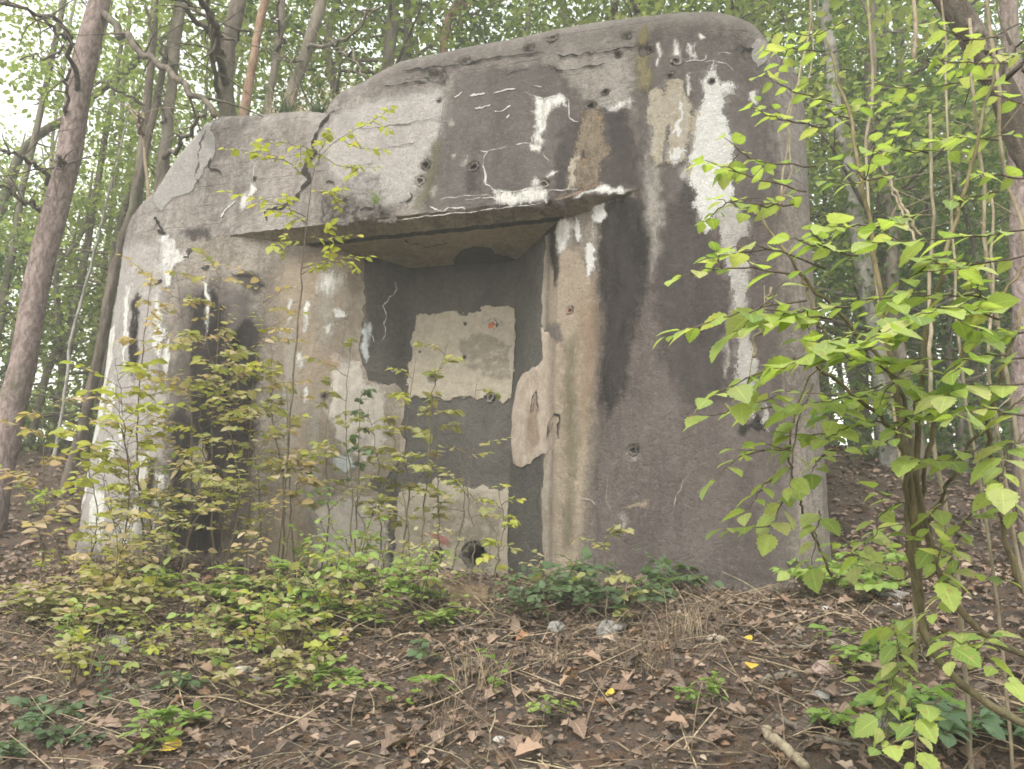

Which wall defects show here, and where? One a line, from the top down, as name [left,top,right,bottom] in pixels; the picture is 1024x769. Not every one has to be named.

leakage [78,216,260,553]
crack [194,127,226,184]
crack [264,110,335,220]
leakage [265,252,357,572]
peeling [313,234,560,576]
leakage [321,30,790,592]